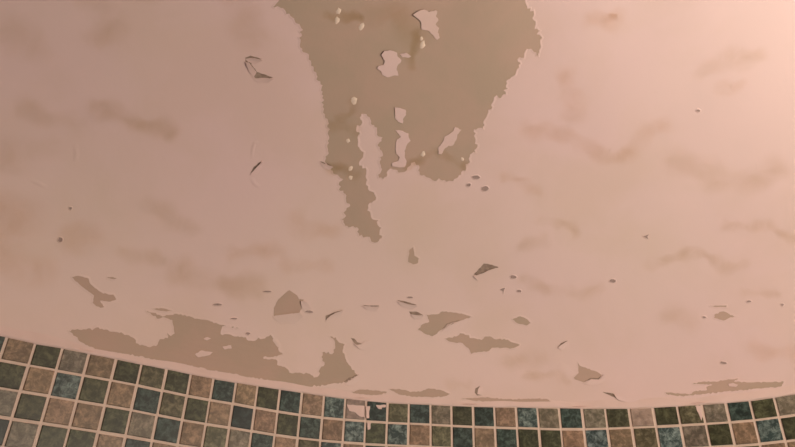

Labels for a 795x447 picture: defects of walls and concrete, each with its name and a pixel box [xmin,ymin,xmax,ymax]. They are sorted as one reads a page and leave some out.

peeling [245,56,273,83]
peeling [271,0,544,244]
peeling [474,264,499,281]
peeling [70,274,118,310]
peeling [262,290,314,324]
peeling [397,296,521,355]
peeling [67,306,451,399]
peeling [460,386,551,403]
peeling [572,361,639,403]
peeling [664,377,786,398]